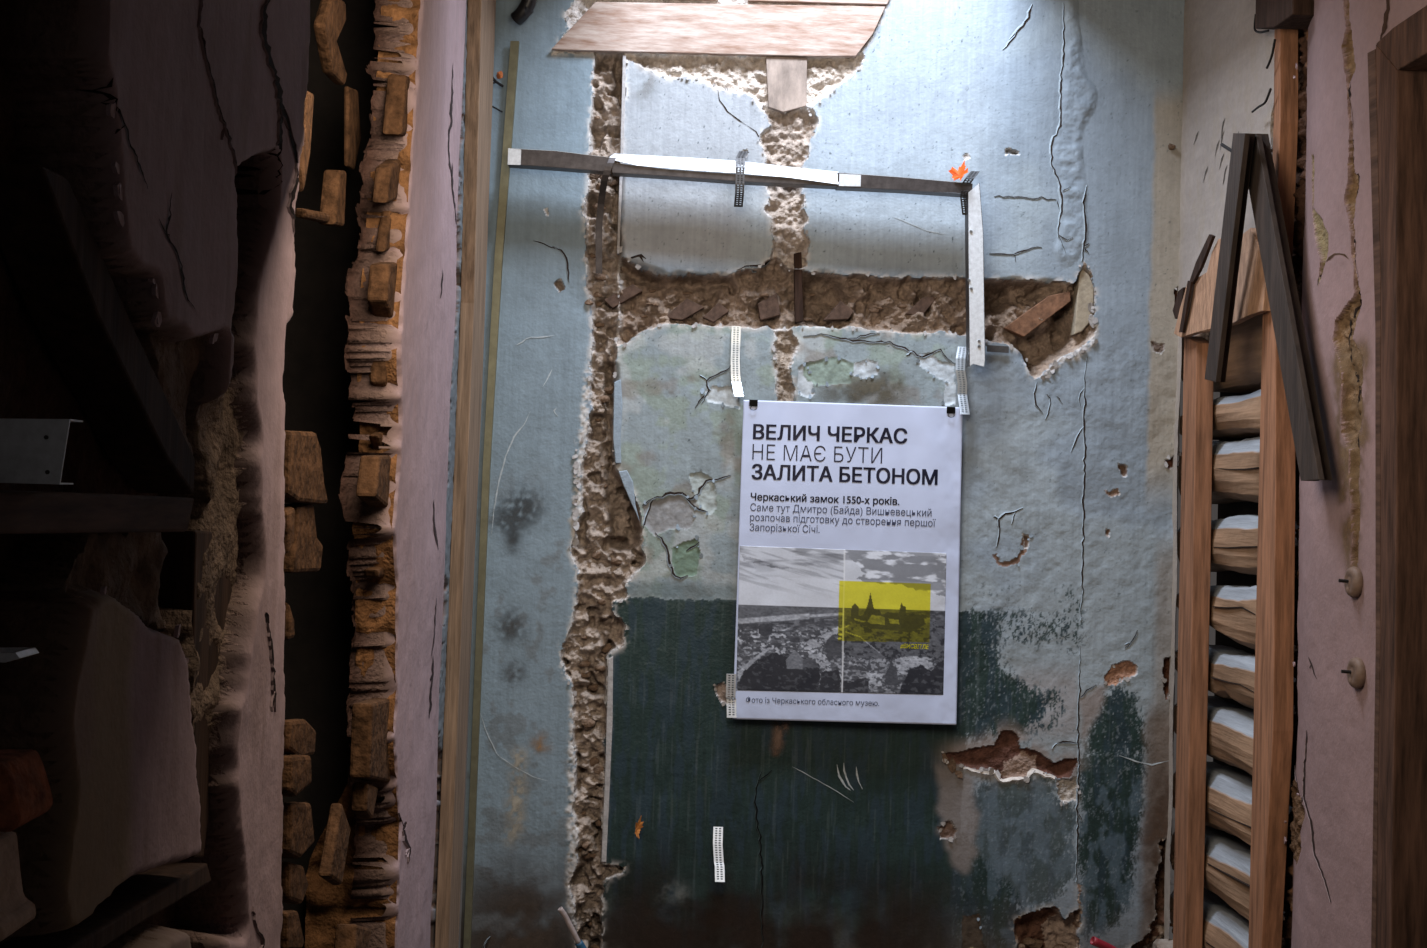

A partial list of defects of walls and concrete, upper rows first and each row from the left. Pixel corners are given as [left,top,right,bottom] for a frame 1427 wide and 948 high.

crack [197,0,299,232]
crack [989,3,1090,262]
crack [1332,0,1390,567]
spalling [772,326,880,402]
peeling [916,331,956,406]
peeling [1041,303,1098,381]
peeling [569,449,581,547]
spalling [1104,660,1138,686]
spalling [941,730,1081,806]
spalling [1013,883,1083,948]
spalling [1131,834,1174,948]